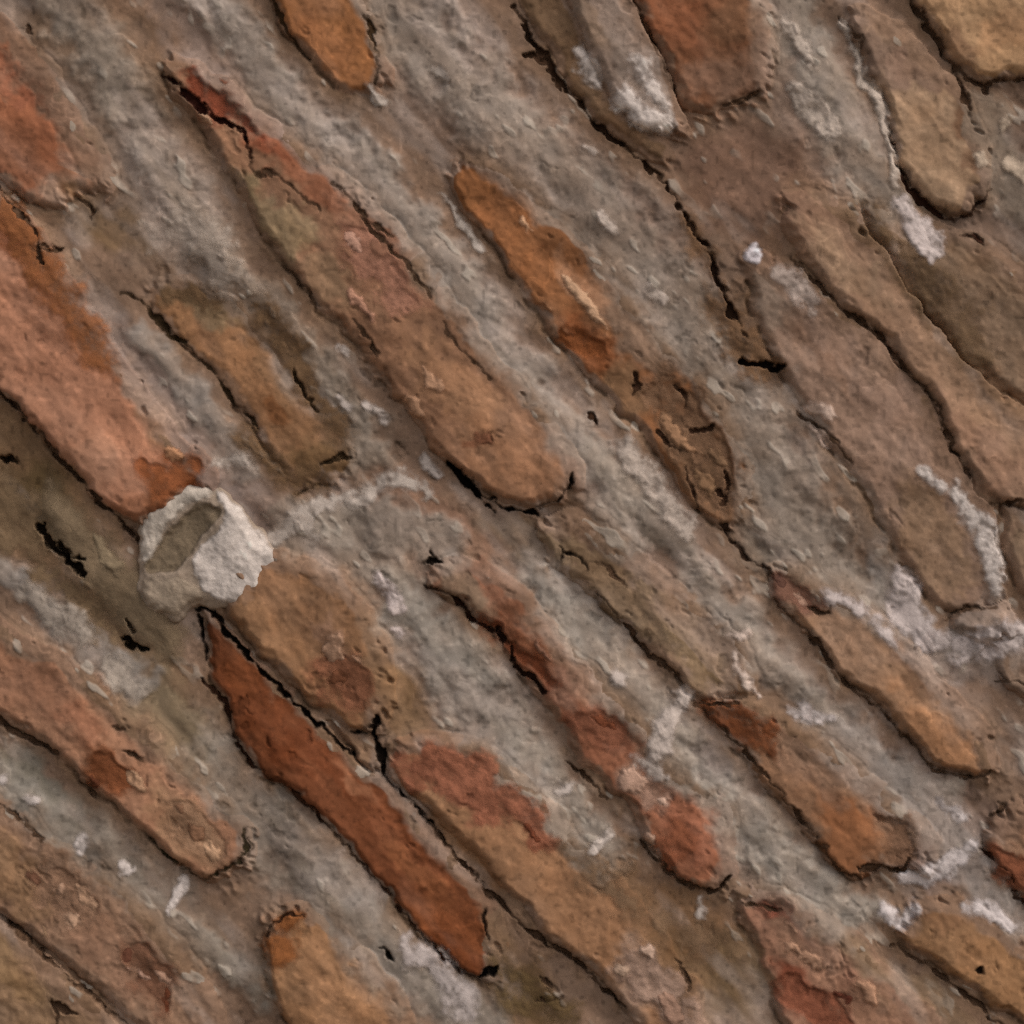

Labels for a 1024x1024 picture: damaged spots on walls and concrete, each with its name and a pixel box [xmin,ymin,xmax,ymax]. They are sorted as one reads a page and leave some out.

damp [574,47,601,87]
damp [614,54,675,135]
damp [786,82,841,139]
crack [162,76,430,297]
crack [511,3,785,373]
damp [838,20,994,368]
damp [1002,155,1024,183]
crack [37,523,87,577]
damp [917,465,1007,596]
crack [123,620,149,650]
crack [426,587,547,694]
crack [196,606,626,1008]